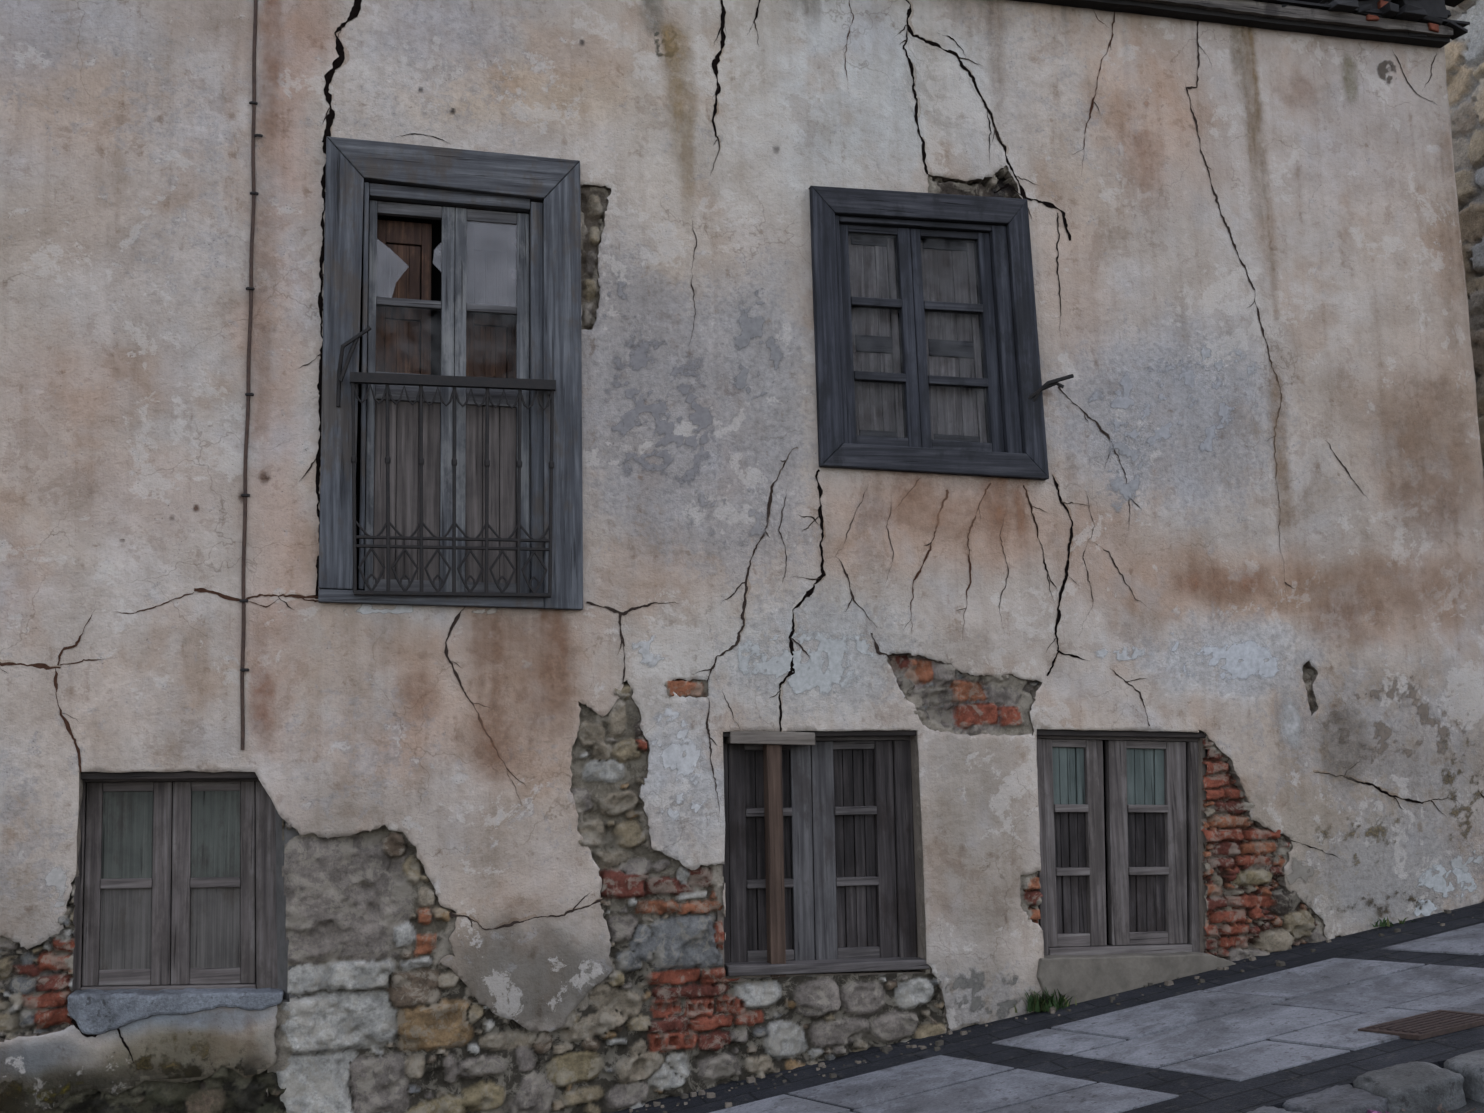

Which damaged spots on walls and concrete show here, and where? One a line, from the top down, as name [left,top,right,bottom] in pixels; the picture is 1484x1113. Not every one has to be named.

crack [710,0,761,176]
crack [894,0,1071,338]
crack [0,0,362,772]
crack [1186,21,1295,598]
crack [444,607,526,805]
flaking render [627,730,649,759]
flaking render [664,679,708,698]
crack [692,386,1150,823]
flaking render [887,654,1039,736]
flaking render [1201,737,1288,956]
flaking render [1,928,75,1035]
flaking render [598,858,773,1061]